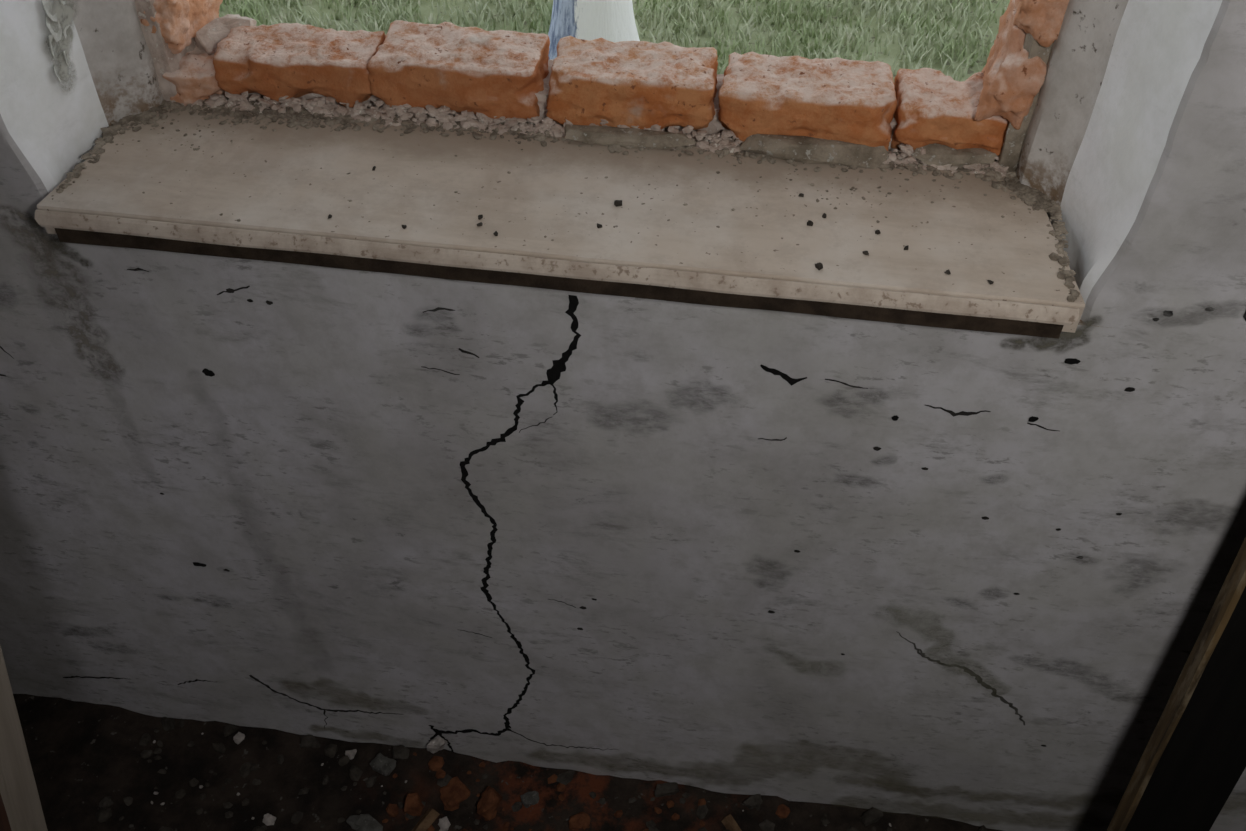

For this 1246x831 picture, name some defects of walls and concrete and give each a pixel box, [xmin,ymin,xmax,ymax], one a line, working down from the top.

peeling [41,0,75,89]
crack [249,295,618,752]
crack [897,632,1025,725]